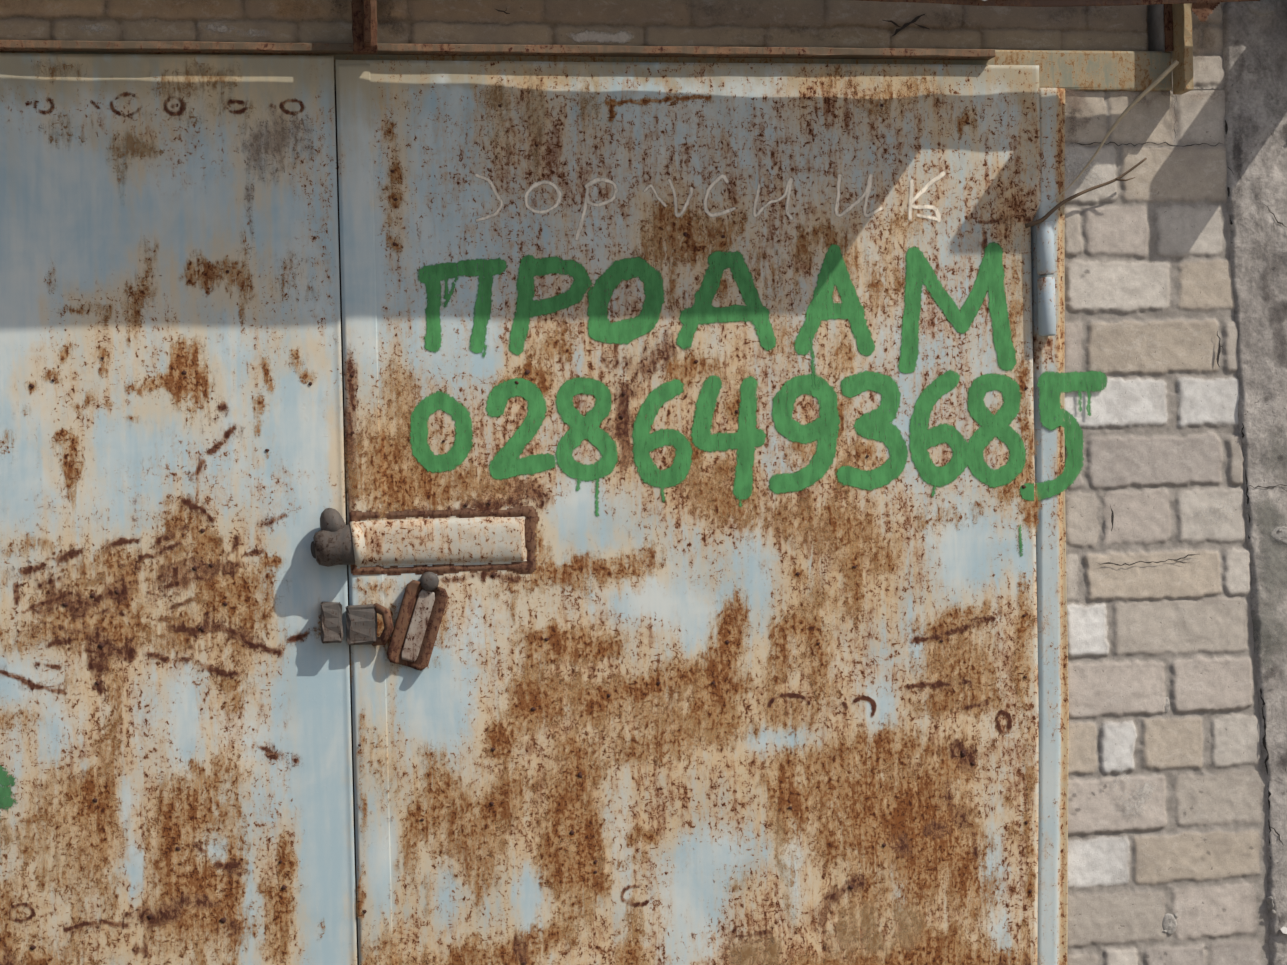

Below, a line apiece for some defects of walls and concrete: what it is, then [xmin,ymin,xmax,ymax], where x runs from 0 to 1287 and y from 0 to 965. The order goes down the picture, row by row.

rust [29,341,76,394]
rust [53,427,87,514]
rust [62,241,162,378]
rust [124,334,215,425]
rust [90,60,321,330]
rust [252,357,274,459]
rust [634,200,748,312]
rust [914,252,1042,537]
crack [1098,554,1198,566]
rust [344,324,1042,965]
rust [0,496,302,965]
crack [1260,688,1283,871]